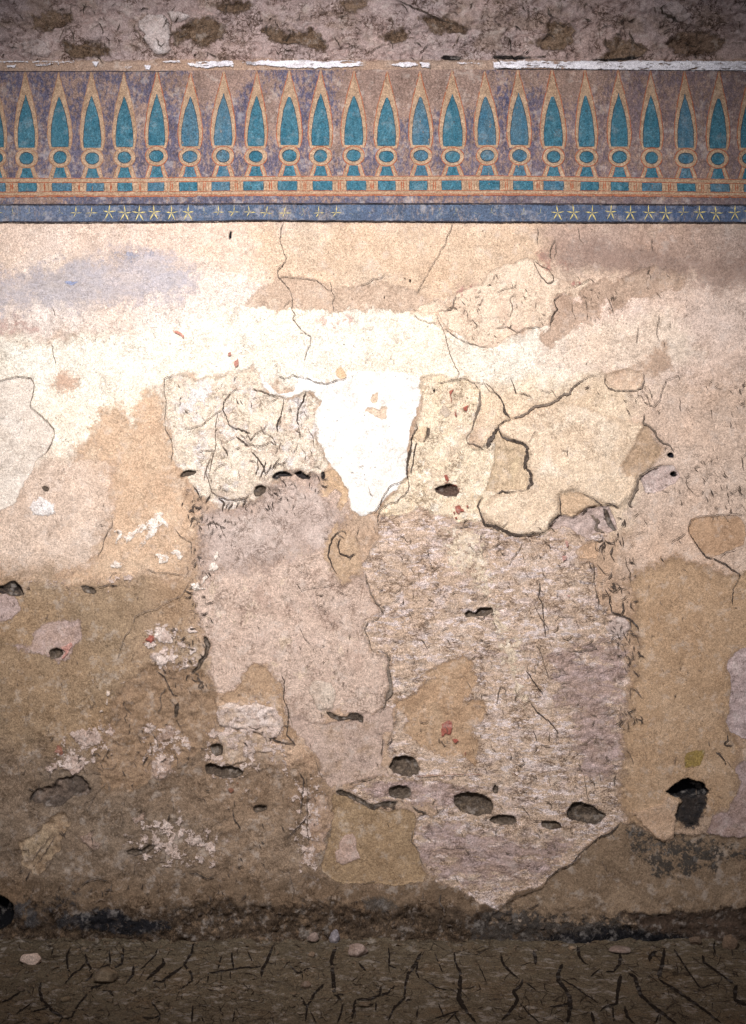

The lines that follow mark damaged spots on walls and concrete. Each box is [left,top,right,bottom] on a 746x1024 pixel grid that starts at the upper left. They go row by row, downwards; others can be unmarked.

spalling [0,581,24,621]
spalling [15,619,82,664]
crack [0,221,746,1024]
spalling [145,363,680,910]
spalling [18,754,91,876]